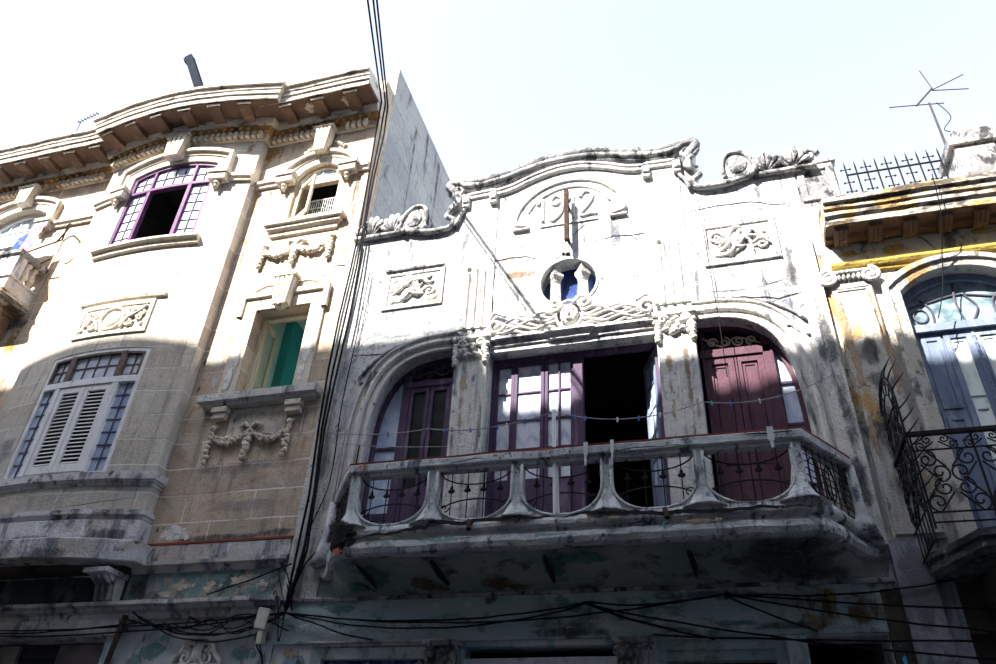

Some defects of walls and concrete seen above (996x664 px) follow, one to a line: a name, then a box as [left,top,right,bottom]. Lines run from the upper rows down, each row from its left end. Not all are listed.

water stain [386,262,445,274]
water stain [3,319,27,353]
water stain [813,298,838,361]
water stain [863,338,887,386]
water stain [838,390,857,446]
water stain [852,458,872,506]
water stain [84,528,126,539]
spalling [326,520,357,554]
peeling [158,574,269,597]